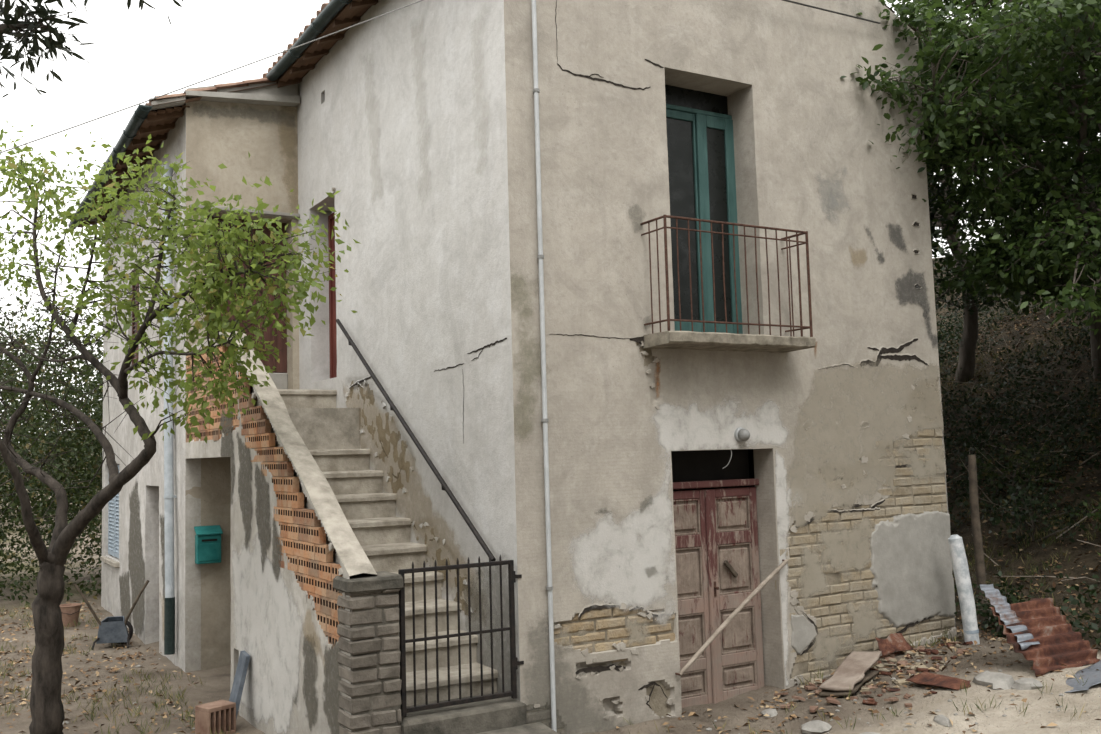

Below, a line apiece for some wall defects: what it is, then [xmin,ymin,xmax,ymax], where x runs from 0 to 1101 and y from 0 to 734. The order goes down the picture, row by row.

crack [555,0,664,90]
crack [435,338,507,441]
crack [549,334,644,347]
crack [818,337,929,370]
spalling [186,345,368,649]
spalling [775,378,955,686]
spalling [554,603,679,679]